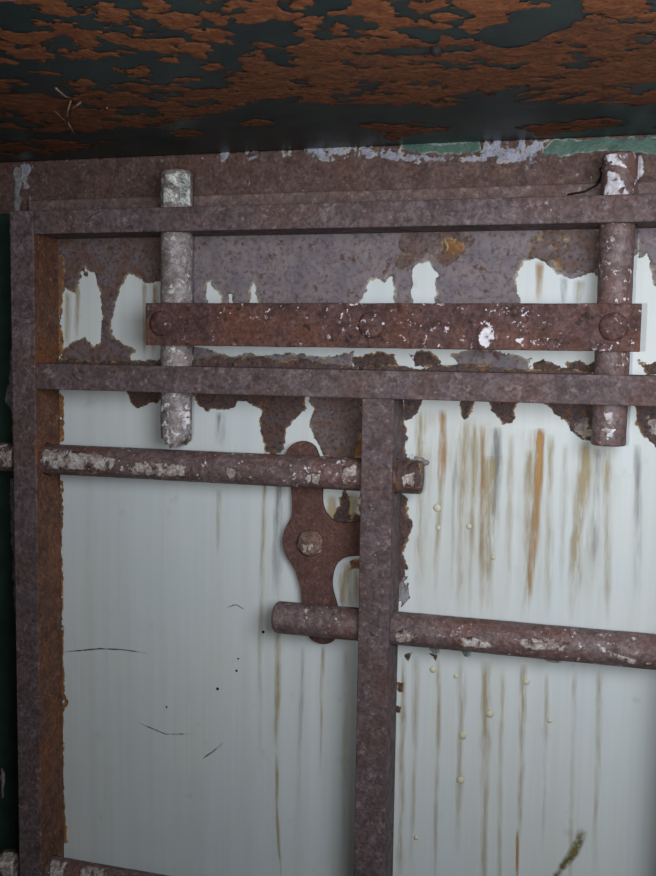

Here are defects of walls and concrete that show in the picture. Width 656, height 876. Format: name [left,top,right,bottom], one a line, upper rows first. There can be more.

peeling [0,0,552,92]
rust [0,9,656,156]
peeling [58,237,161,365]
peeling [192,229,599,304]
peeling [489,402,518,425]
peeling [544,403,616,441]
peeling [635,406,656,447]
rust [393,417,429,607]
rust [473,432,499,527]
rust [528,431,551,557]
rust [577,447,589,509]
rust [554,834,583,876]